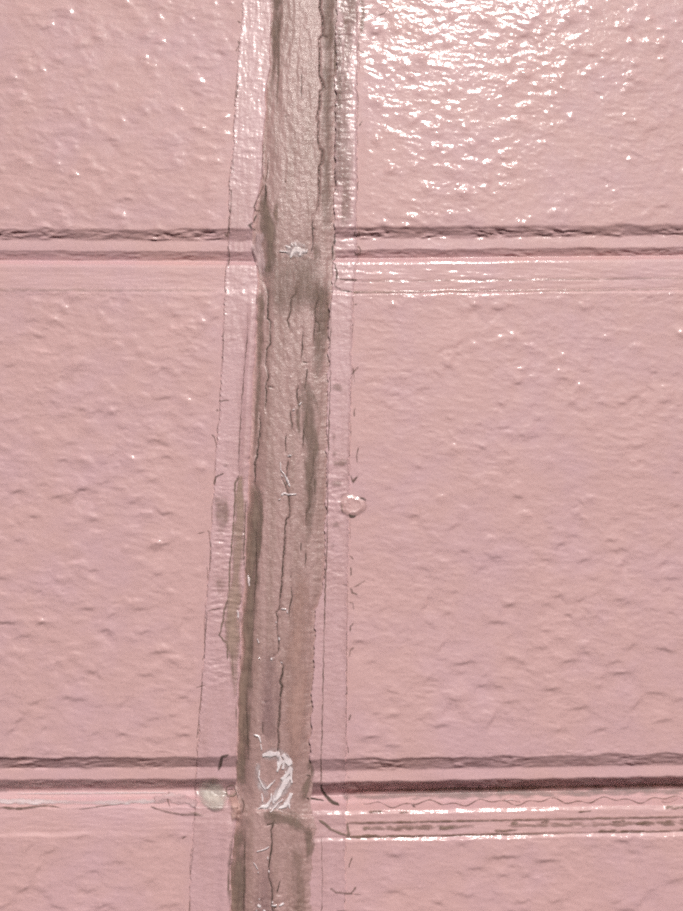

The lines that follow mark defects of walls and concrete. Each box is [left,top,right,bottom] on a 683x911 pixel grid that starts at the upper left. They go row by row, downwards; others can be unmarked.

crack [217,0,360,751]
peeling [219,476,250,675]
peeling [258,751,293,812]
crack [306,661,339,805]
crack [267,822,280,911]